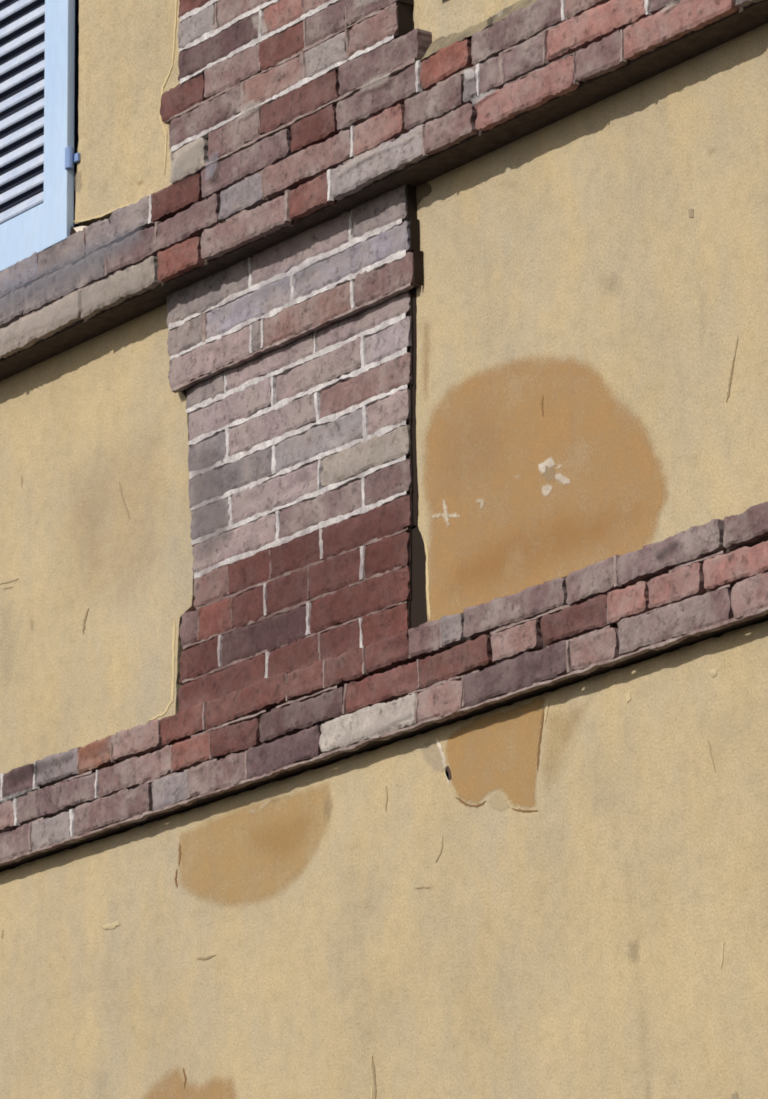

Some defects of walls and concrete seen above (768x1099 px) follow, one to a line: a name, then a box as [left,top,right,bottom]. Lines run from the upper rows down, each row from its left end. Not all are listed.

water stain [426,363,664,621]
peeling [436,699,549,812]
water stain [181,789,326,902]